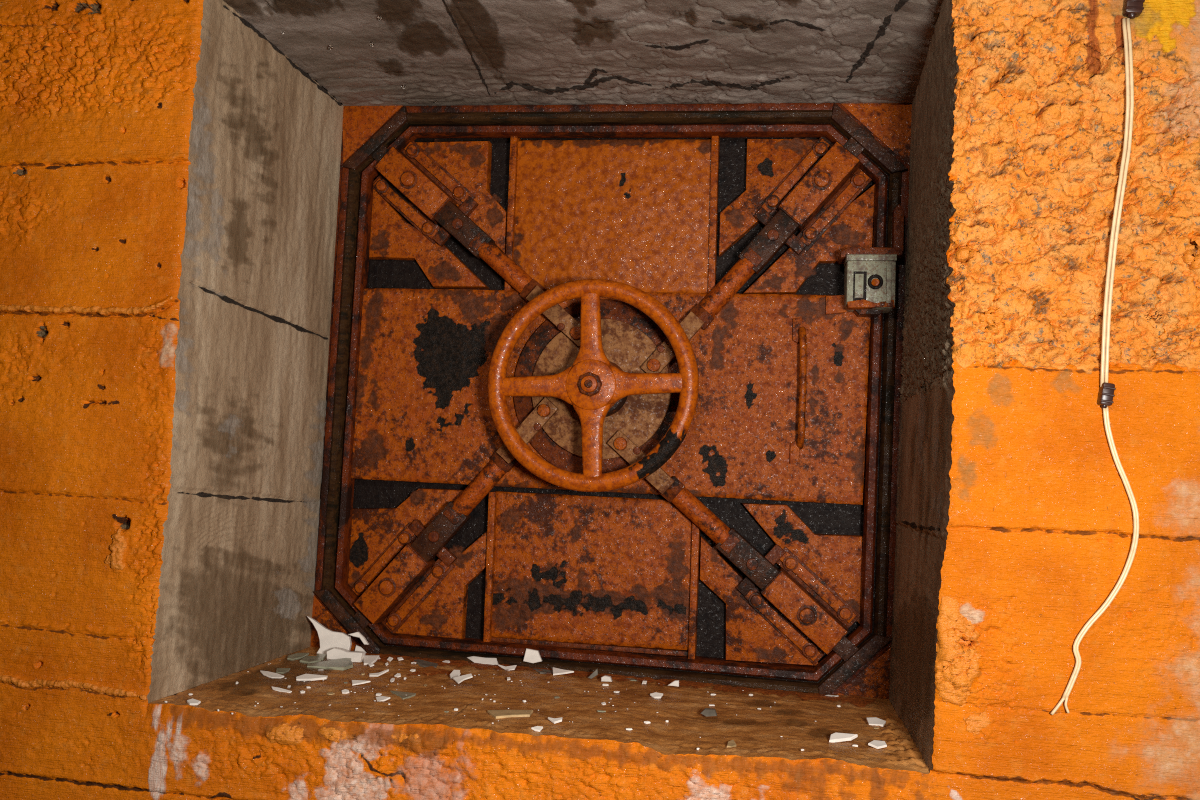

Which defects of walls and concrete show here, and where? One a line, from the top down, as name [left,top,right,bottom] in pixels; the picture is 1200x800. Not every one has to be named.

crack [0,287,328,340]
corrosion [413,262,528,432]
corrosion [779,294,895,416]
corrosion [603,429,686,495]
corrosion [690,445,728,497]
corrosion [774,509,809,544]
crack [902,521,940,531]
corrosion [492,536,690,631]
water stain [148,705,208,800]
water stain [290,722,469,800]
water stain [688,760,730,800]
crack [958,772,1191,800]